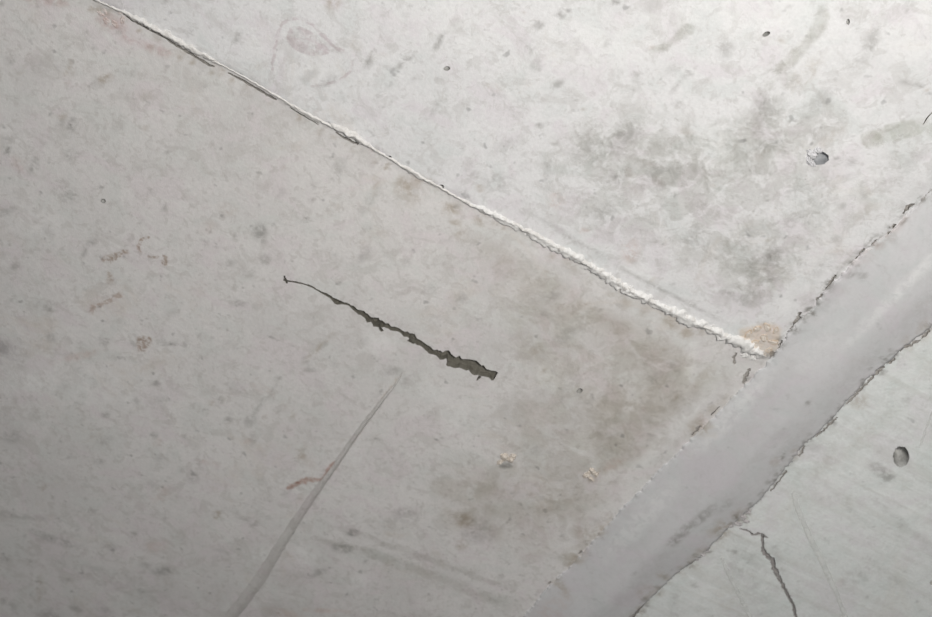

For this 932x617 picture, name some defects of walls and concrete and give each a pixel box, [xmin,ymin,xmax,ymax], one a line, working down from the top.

crack [283,276,498,381]
crack [739,528,797,617]